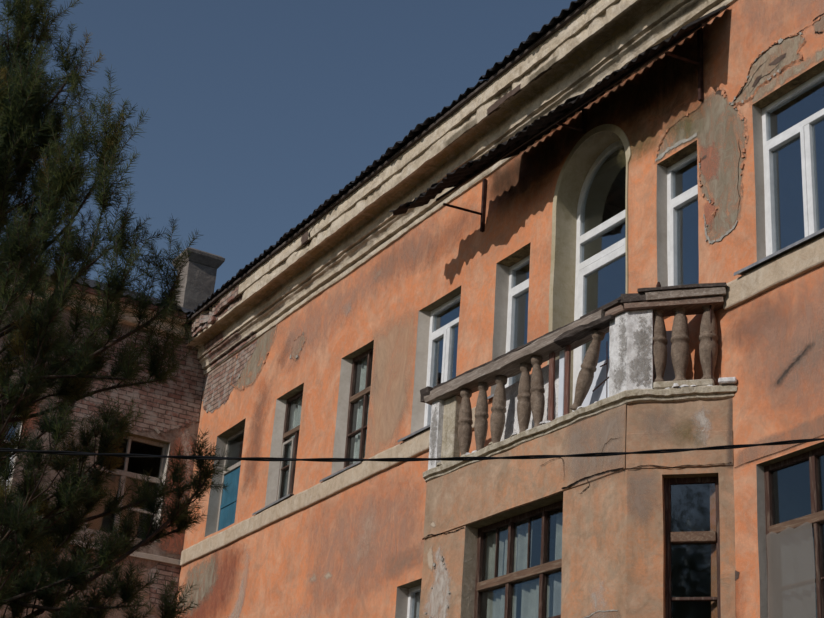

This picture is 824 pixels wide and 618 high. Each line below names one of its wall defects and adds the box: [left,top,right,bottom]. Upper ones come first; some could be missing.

flaking render [655,13,824,244]
crack [543,457,732,494]
flaking render [425,547,451,618]